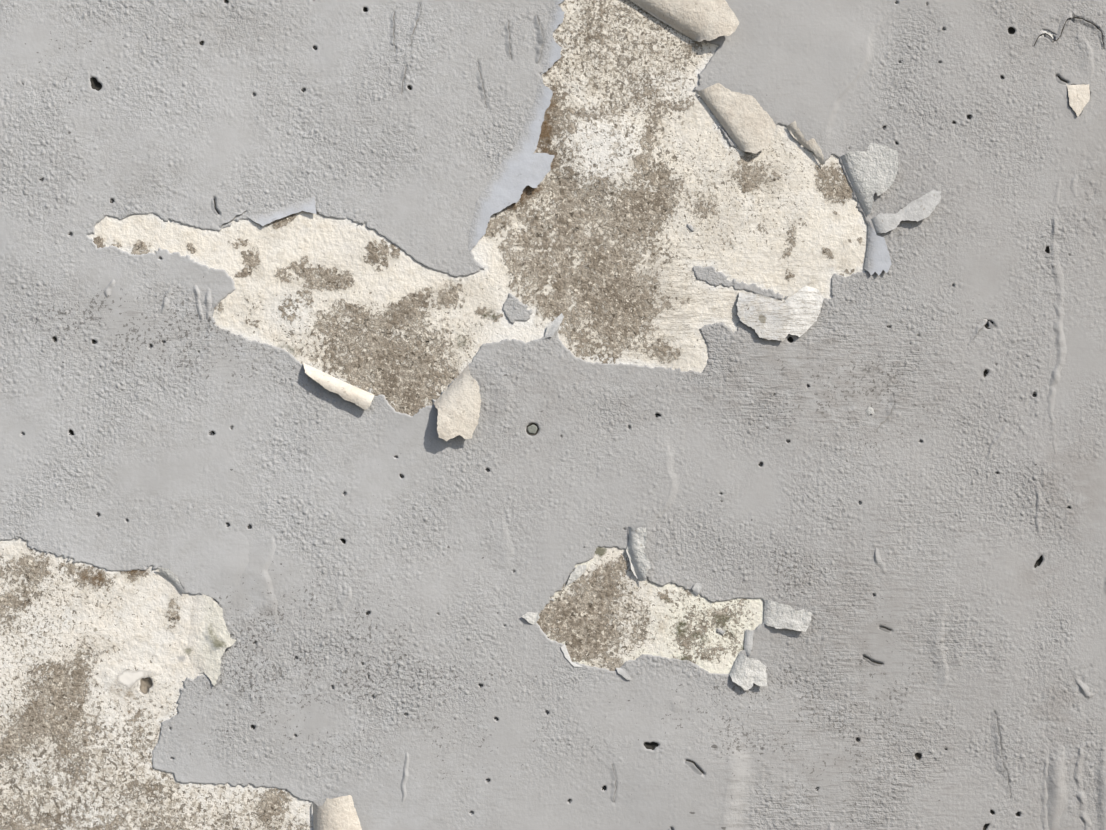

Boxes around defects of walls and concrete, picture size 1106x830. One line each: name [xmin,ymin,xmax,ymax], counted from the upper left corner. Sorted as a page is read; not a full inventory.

crack [1032,13,1104,49]
peeling [1066,84,1090,116]
peeling [87,0,941,441]
peeling [0,534,362,830]
peeling [522,526,812,690]
crack [685,760,704,775]